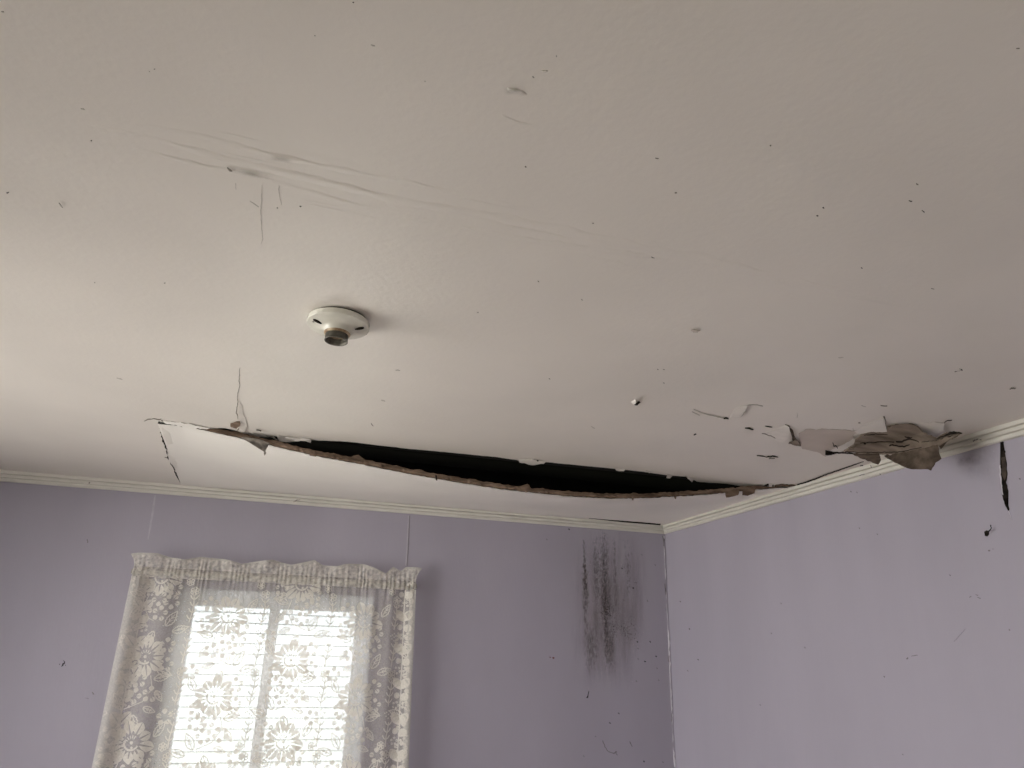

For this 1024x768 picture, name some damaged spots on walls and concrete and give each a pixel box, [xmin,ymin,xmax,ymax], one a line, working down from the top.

crack [145,369,247,482]
peeling [693,404,962,476]
crack [999,442,1012,519]